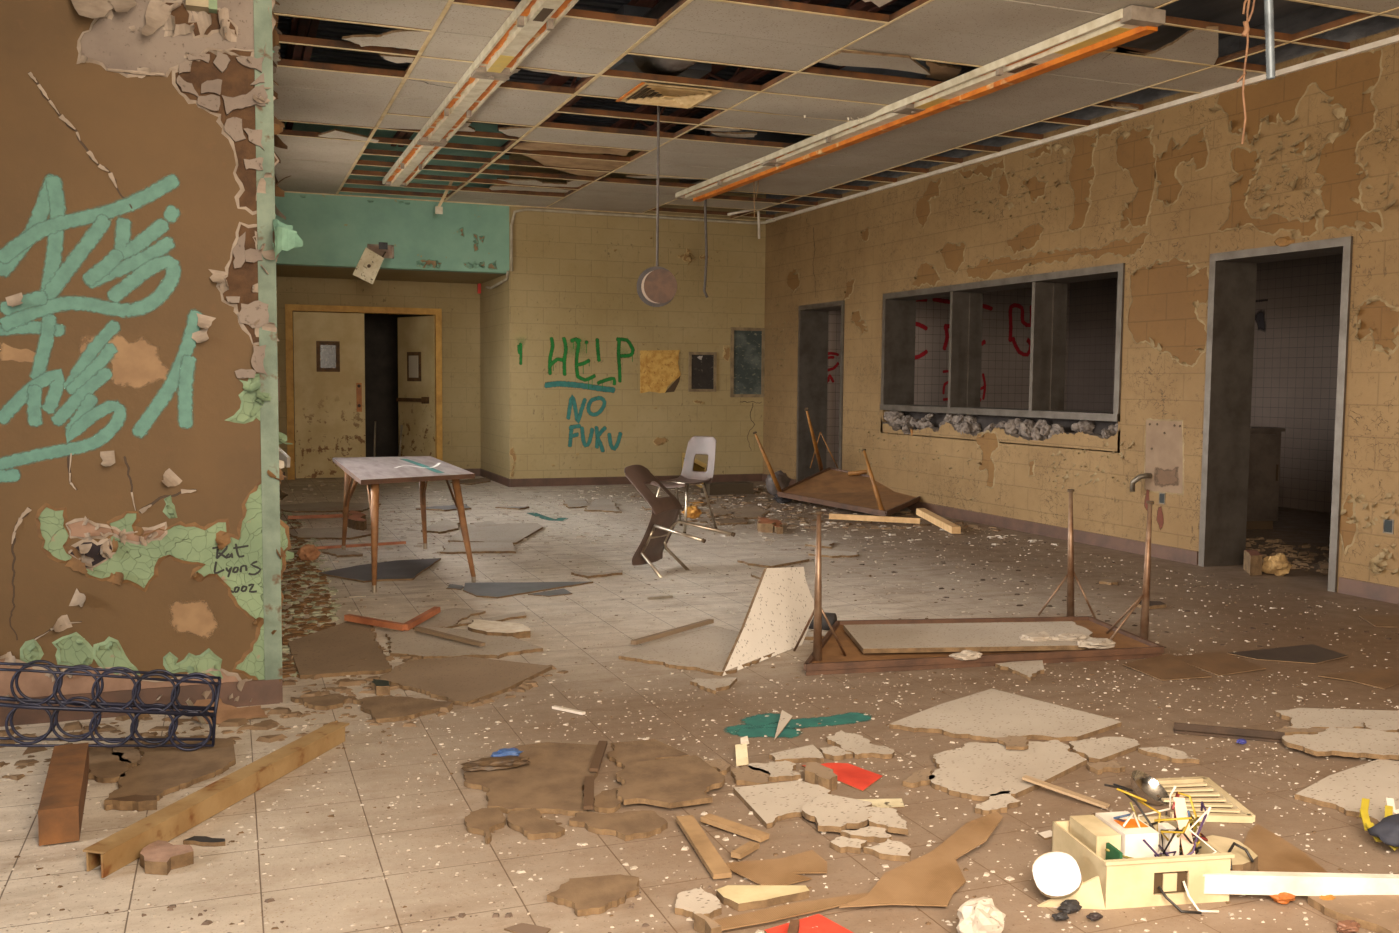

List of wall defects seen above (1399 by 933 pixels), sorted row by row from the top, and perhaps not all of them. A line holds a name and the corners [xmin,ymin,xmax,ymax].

spalling [1103,26,1218,65]
peeling [71,0,303,424]
peeling [911,103,1210,367]
peeling [1209,48,1399,239]
peeling [1355,295,1399,355]
spalling [857,410,1134,500]
peeling [0,432,342,703]